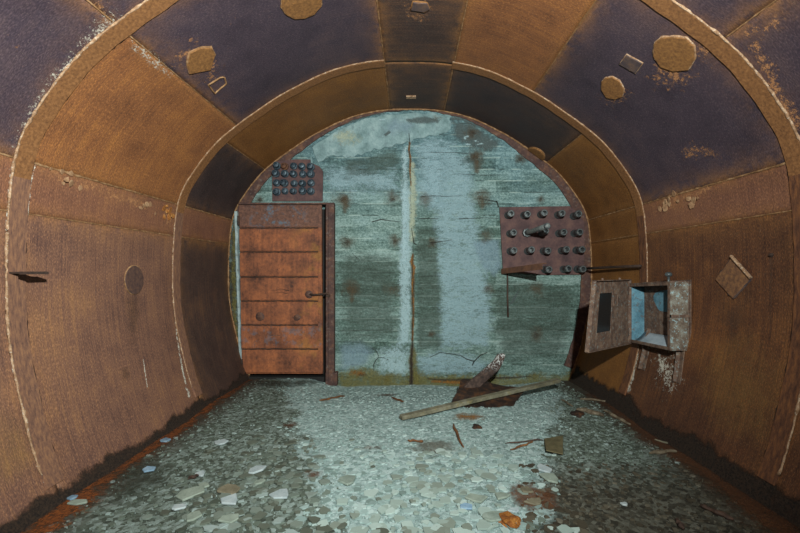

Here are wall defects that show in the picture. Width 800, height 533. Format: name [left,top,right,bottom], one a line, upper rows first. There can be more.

rust [735,9,800,127]
leakage [327,139,499,387]
crack [431,352,487,365]
rust [22,380,250,533]
leakage [488,354,800,530]